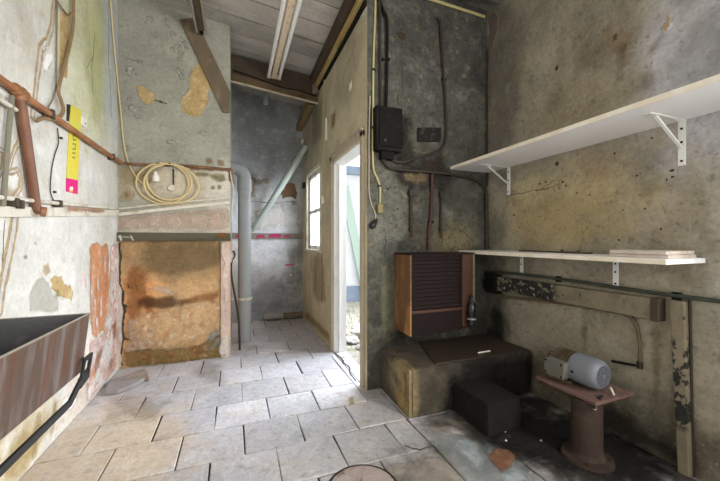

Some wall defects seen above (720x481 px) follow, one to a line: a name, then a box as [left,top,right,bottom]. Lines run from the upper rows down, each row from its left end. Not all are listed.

flaking render [126,84,167,119]
flaking render [178,62,212,119]
flaking render [279,181,299,201]
water stain [128,270,151,321]
flaking render [48,241,234,399]
crack [335,352,356,381]